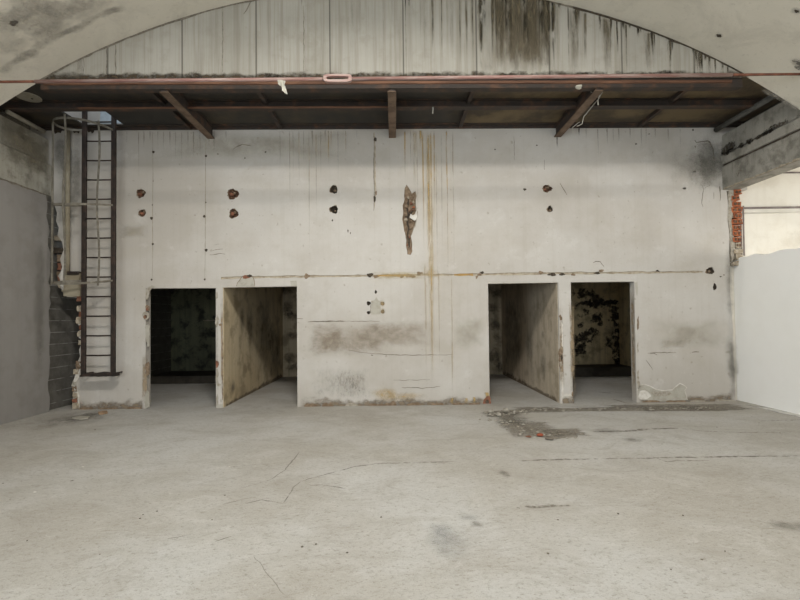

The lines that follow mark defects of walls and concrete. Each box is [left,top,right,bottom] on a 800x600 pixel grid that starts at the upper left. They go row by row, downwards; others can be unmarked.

leakage [465,0,561,53]
leakage [599,17,655,50]
spalling [402,185,418,255]
spalling [727,189,743,266]
spalling [53,235,81,345]
leakage [571,288,620,364]
flaking render [637,370,734,402]